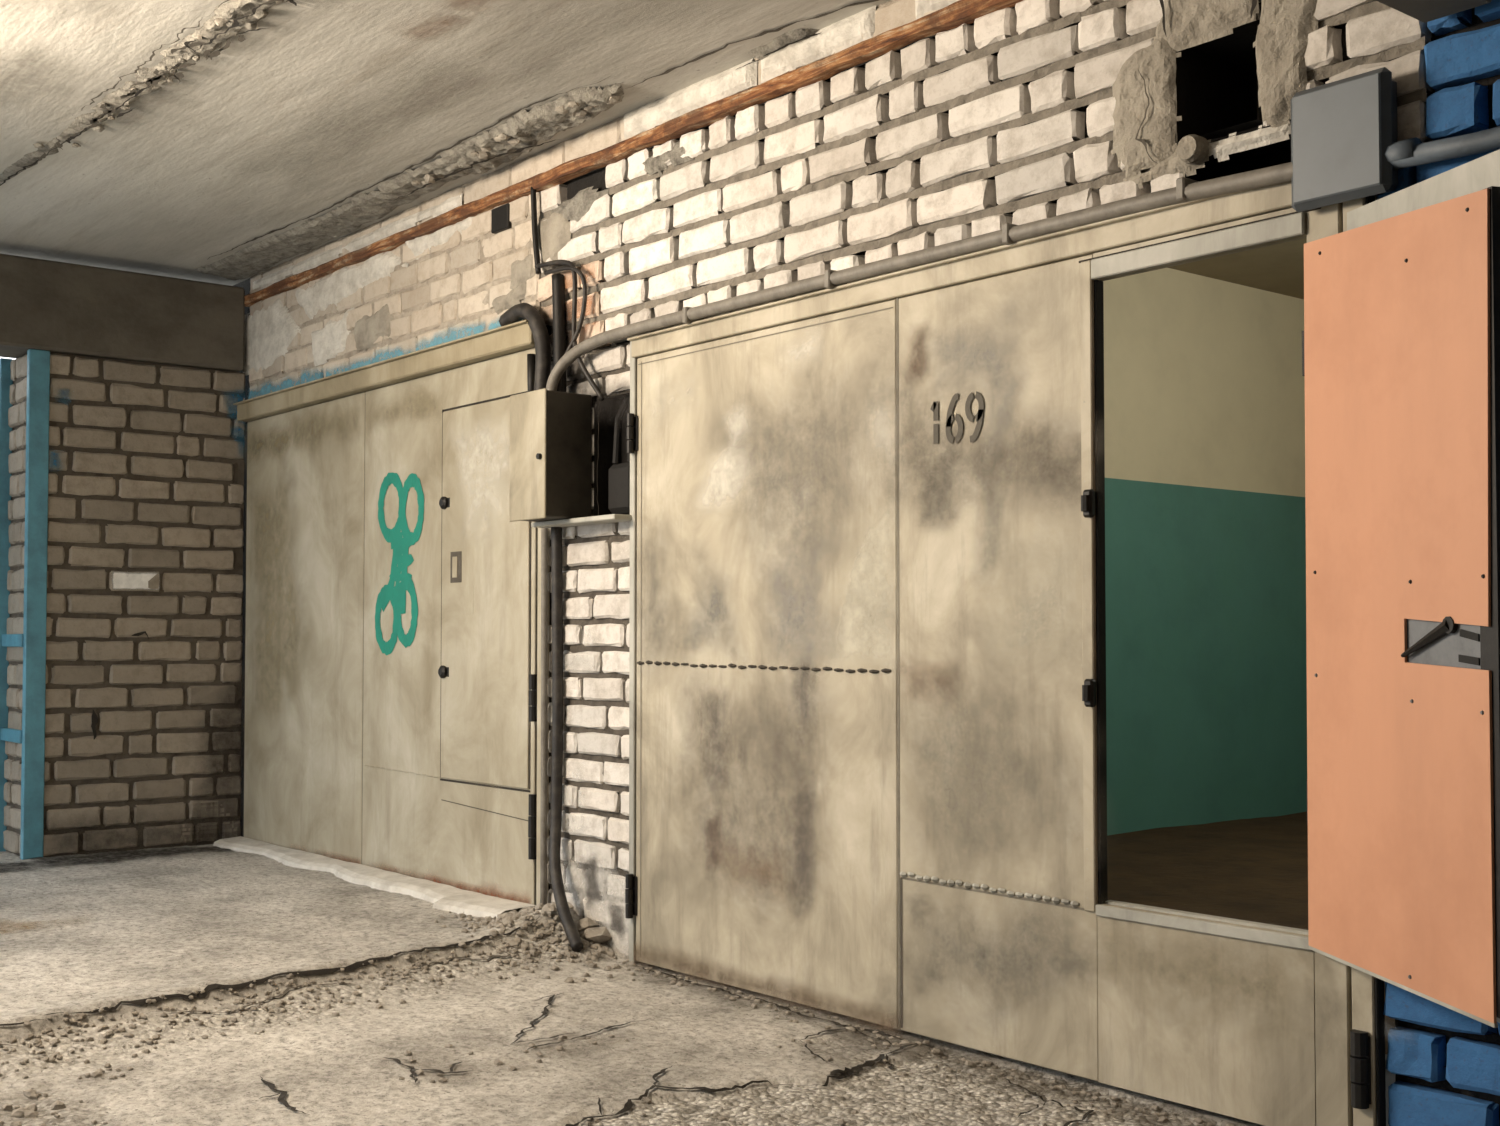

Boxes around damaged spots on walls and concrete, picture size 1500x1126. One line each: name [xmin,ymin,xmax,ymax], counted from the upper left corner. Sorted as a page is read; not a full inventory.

flaking render [915,0,959,20]
spalling [195,0,879,376]
crack [510,993,651,1050]
crack [565,966,917,1126]